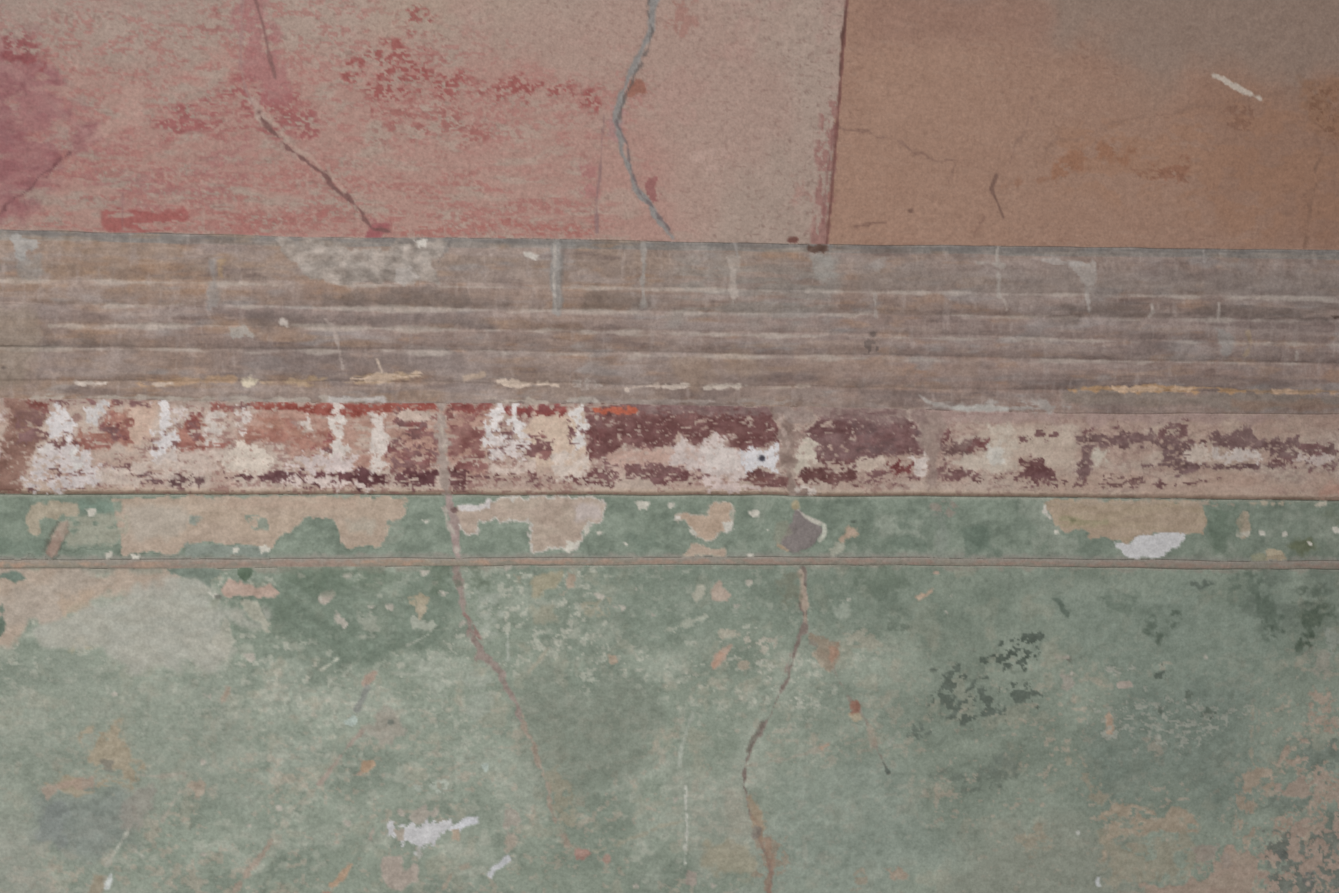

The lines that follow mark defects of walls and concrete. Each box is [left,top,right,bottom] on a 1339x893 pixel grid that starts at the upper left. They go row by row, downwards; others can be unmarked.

crack [236,0,392,235]
crack [592,0,676,242]
flaking render [0,369,1339,698]
peeling [379,776,481,892]
peeling [485,807,522,880]
crack [740,565,902,792]
peeling [1058,659,1251,759]
peeling [1241,683,1339,893]